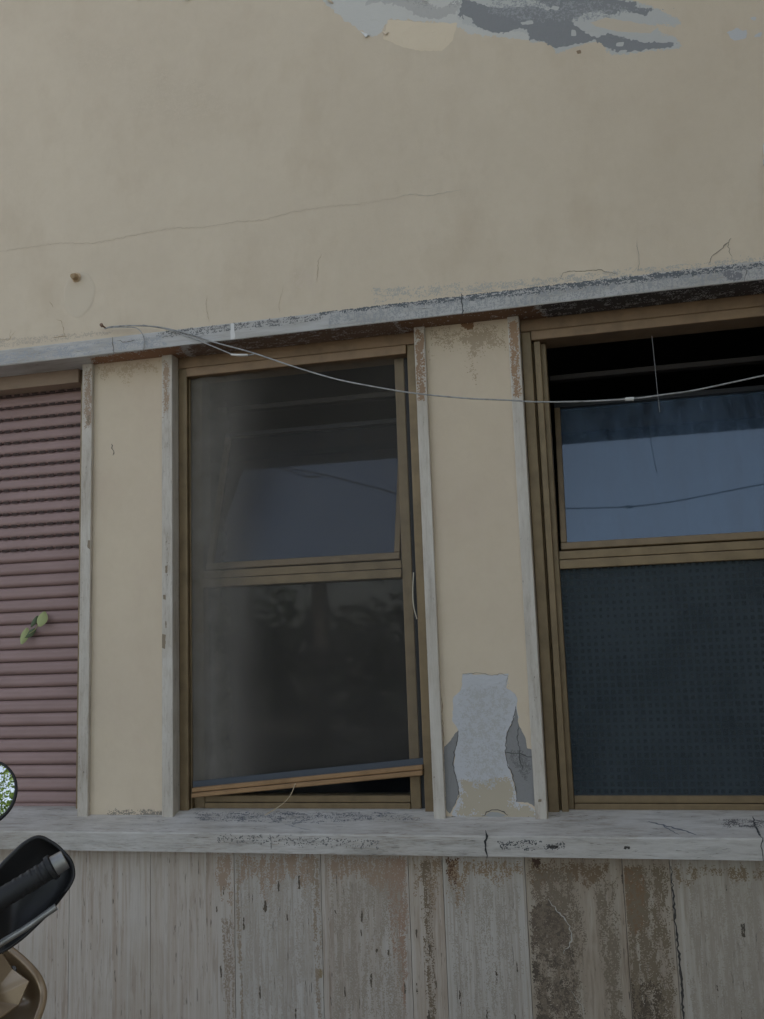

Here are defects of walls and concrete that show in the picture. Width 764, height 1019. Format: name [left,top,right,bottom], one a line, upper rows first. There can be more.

spalling [323,0,681,55]
peeling [444,673,542,817]
leakage [195,811,420,824]
leakage [497,839,565,851]
crack [648,821,696,835]
crack [752,816,764,861]
leakage [217,834,410,1019]
leakage [420,861,437,1019]
leakage [446,863,677,1019]
crack [670,866,685,1019]